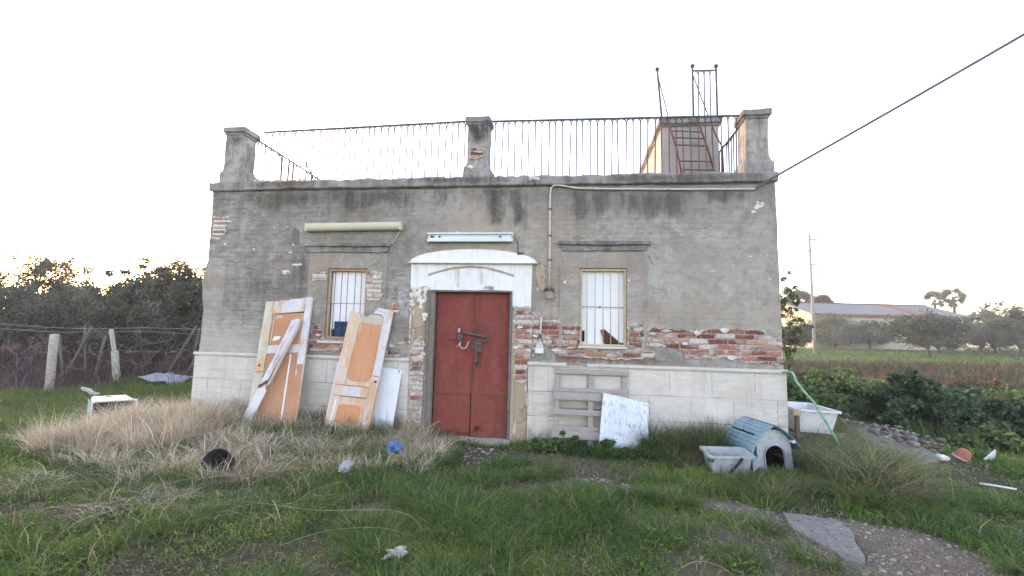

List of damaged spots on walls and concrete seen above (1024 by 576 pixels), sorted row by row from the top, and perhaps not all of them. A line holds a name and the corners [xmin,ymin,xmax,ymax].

spalling [467,147,486,172]
damp [489,191,521,222]
spalling [211,216,231,245]
spalling [365,271,429,423]
spalling [512,306,784,443]